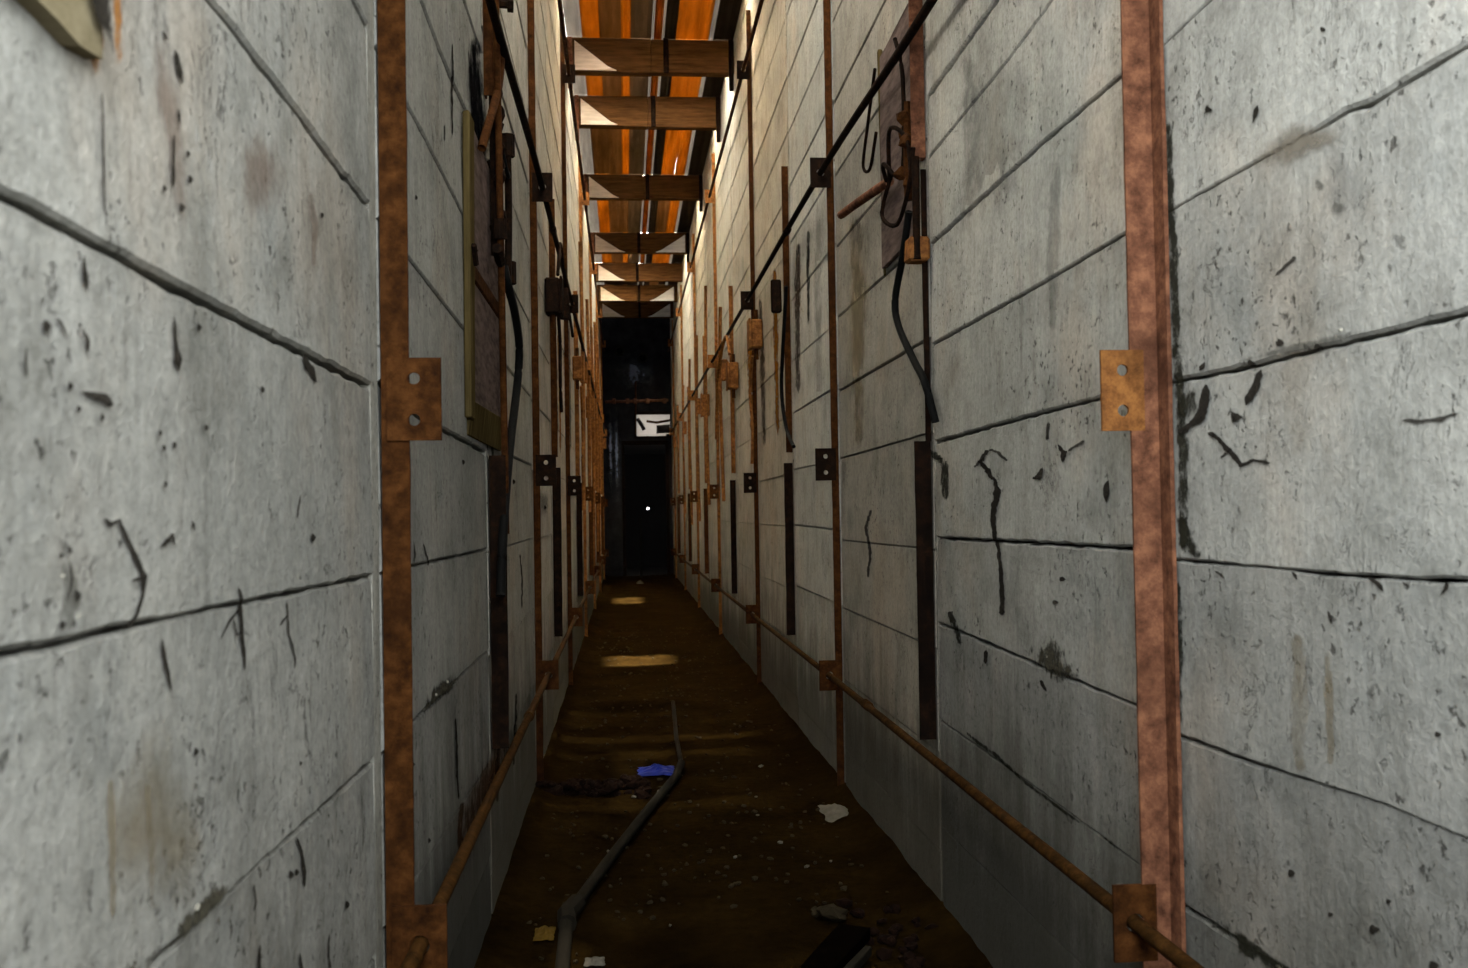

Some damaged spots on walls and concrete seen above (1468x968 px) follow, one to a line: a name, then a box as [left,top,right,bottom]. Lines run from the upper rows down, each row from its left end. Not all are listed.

crack [1178,339,1284,467]
crack [974,422,1084,615]
crack [1102,480,1110,502]
crack [104,518,172,691]
spalling [170,886,227,943]